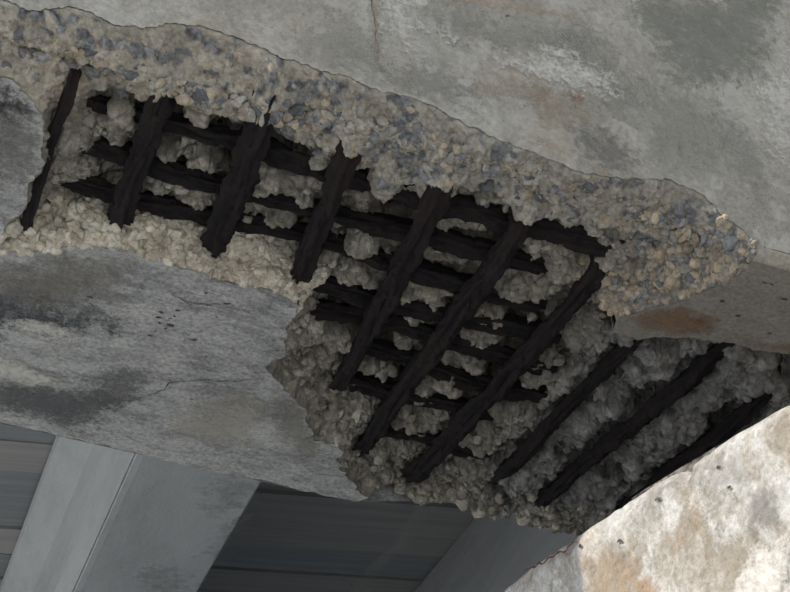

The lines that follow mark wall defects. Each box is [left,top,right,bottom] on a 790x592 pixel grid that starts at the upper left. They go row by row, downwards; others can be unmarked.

leakage [0,80,33,126]
corrosion [20,67,82,236]
leakage [0,287,125,341]
corrosion [60,91,644,485]
spalling [0,0,760,444]
leakage [0,368,150,427]
spalling [333,403,390,497]
spalling [357,300,635,511]
spalling [465,337,790,536]
corrosion [534,342,735,508]
corrosion [614,392,773,512]
crack [523,541,580,572]